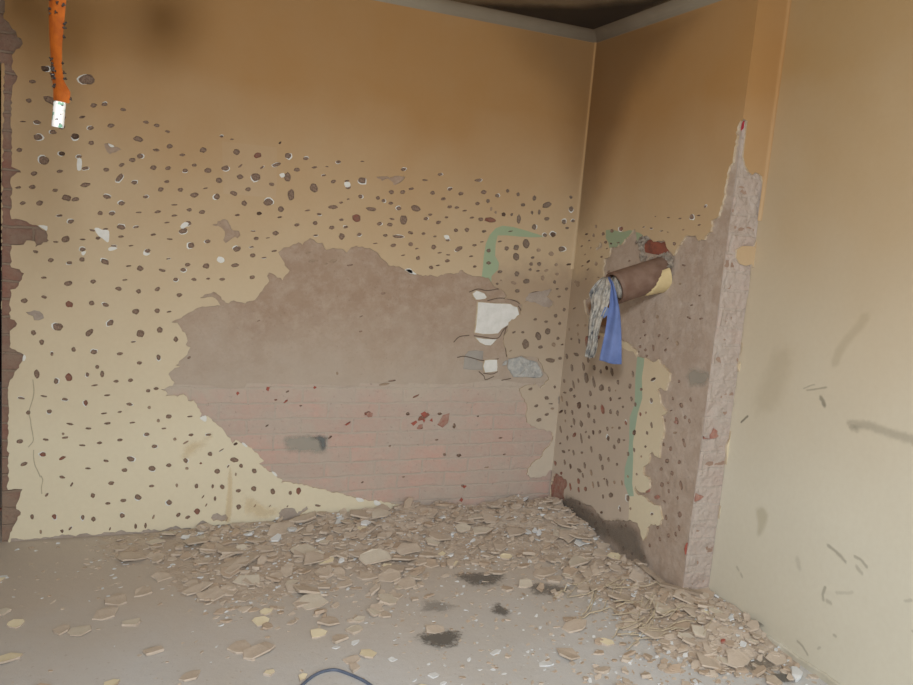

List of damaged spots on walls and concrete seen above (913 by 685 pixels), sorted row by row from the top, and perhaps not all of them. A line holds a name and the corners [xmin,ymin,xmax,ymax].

spalling [0,0,377,673]
spalling [146,120,762,646]
crack [454,327,511,380]
crack [470,288,538,310]